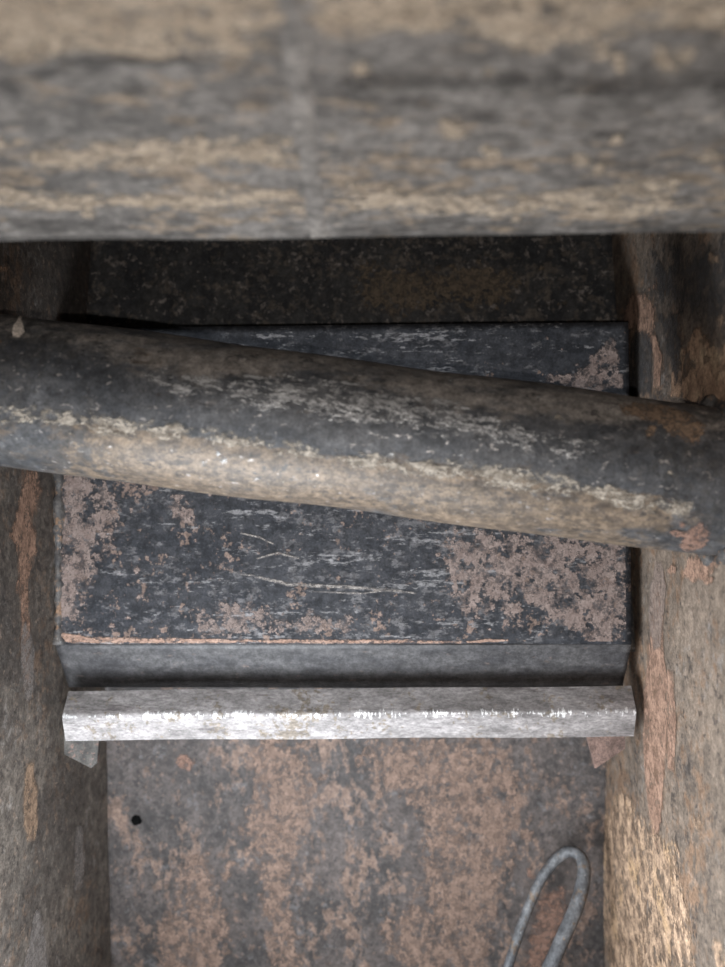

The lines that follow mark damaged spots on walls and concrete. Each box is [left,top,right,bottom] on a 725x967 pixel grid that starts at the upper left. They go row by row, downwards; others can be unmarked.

rust [149,739,326,967]
rust [356,738,533,967]
rust [526,887,567,967]